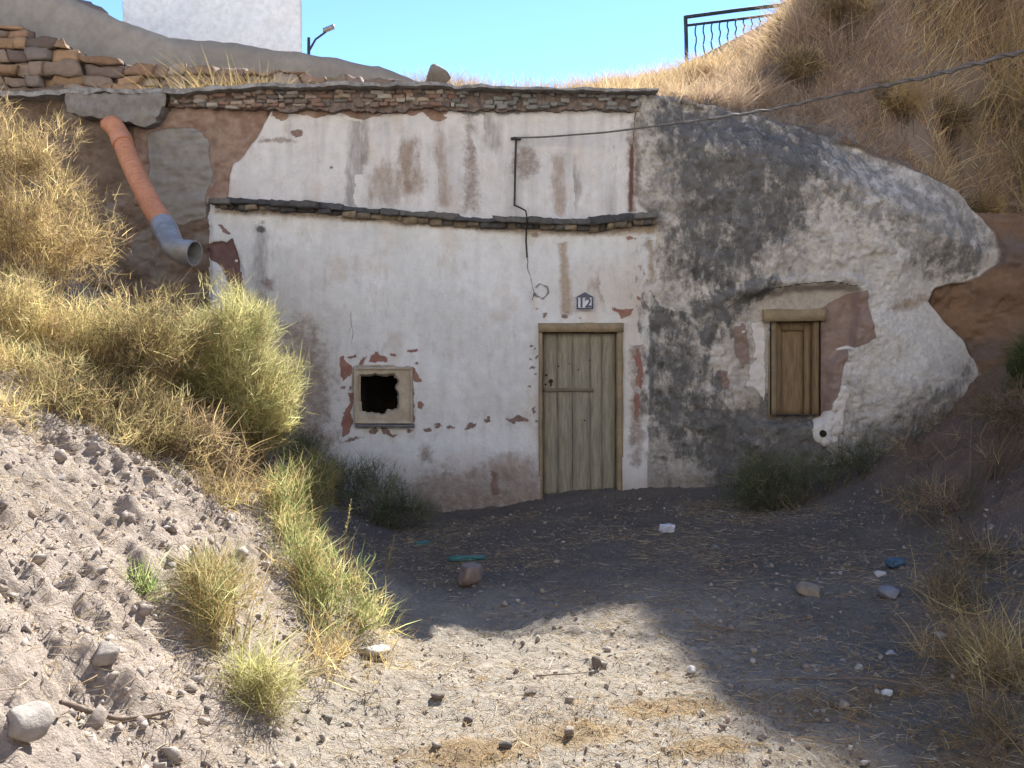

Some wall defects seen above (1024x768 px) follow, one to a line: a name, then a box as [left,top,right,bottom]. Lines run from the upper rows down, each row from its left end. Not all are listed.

spalling [208,224,243,295]
peeling [339,349,491,442]
peeling [505,407,538,424]
peeling [612,296,641,318]
peeling [631,348,645,461]
peeling [732,320,766,400]
leakage [638,94,990,471]
spalling [821,290,876,414]